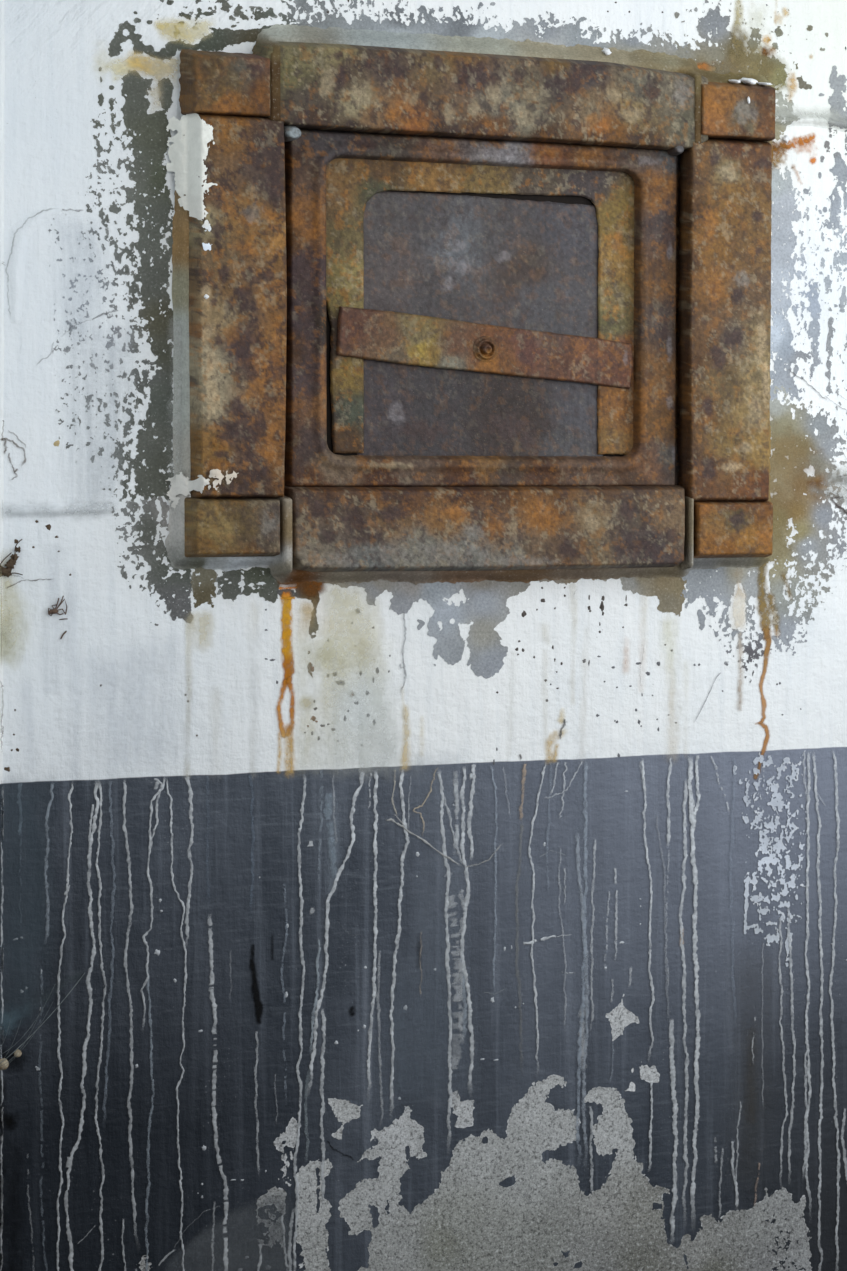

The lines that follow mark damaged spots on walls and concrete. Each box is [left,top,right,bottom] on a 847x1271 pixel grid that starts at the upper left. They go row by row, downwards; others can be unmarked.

corrosion [772,135,815,167]
peeling [48,0,847,742]
corrosion [277,581,323,770]
corrosion [754,563,779,779]
peeling [733,752,807,967]
water stain [44,743,476,1271]
water stain [519,763,596,1187]
water stain [642,756,728,1234]
water stain [778,755,847,1269]
spalling [256,1061,812,1271]
water stain [731,1121,739,1205]